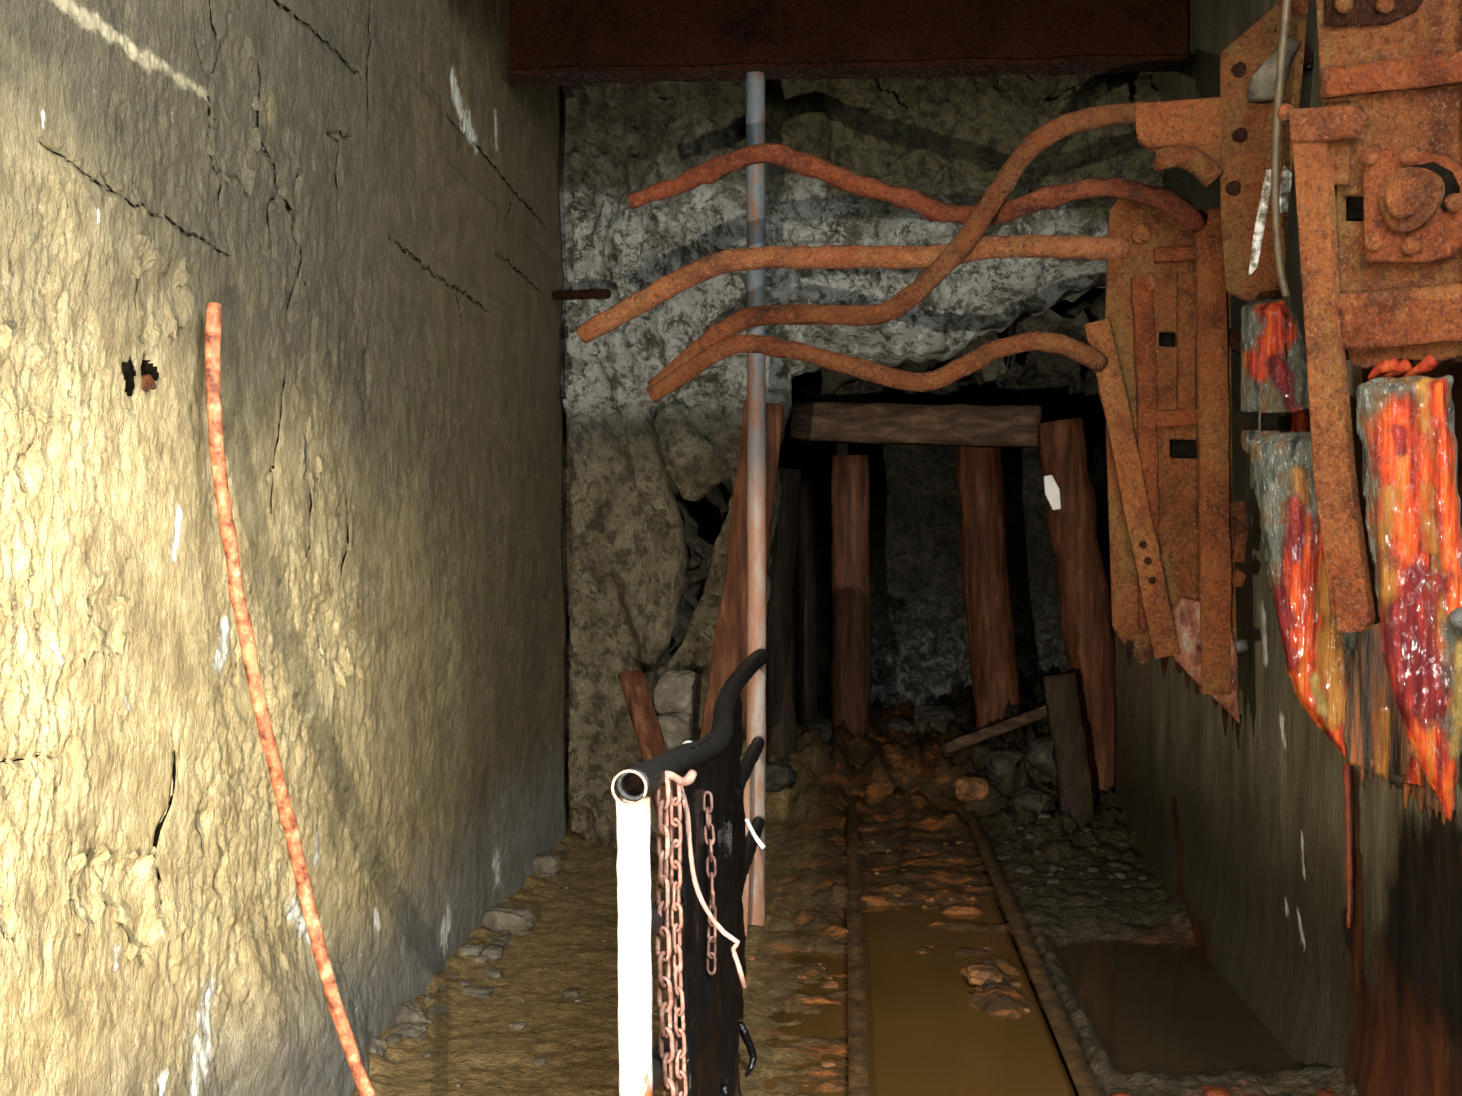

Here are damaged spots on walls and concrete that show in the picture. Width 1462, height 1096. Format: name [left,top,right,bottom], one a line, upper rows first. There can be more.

crack [194,1,217,128]
crack [39,142,236,256]
crack [256,0,371,310]
crack [446,115,542,222]
crack [388,236,489,325]
crack [495,252,543,294]
corrosion [1353,368,1378,611]
water stain [1376,486,1396,624]
water stain [1392,377,1462,757]
corrosion [1422,356,1462,524]
water stain [1381,809,1462,1047]